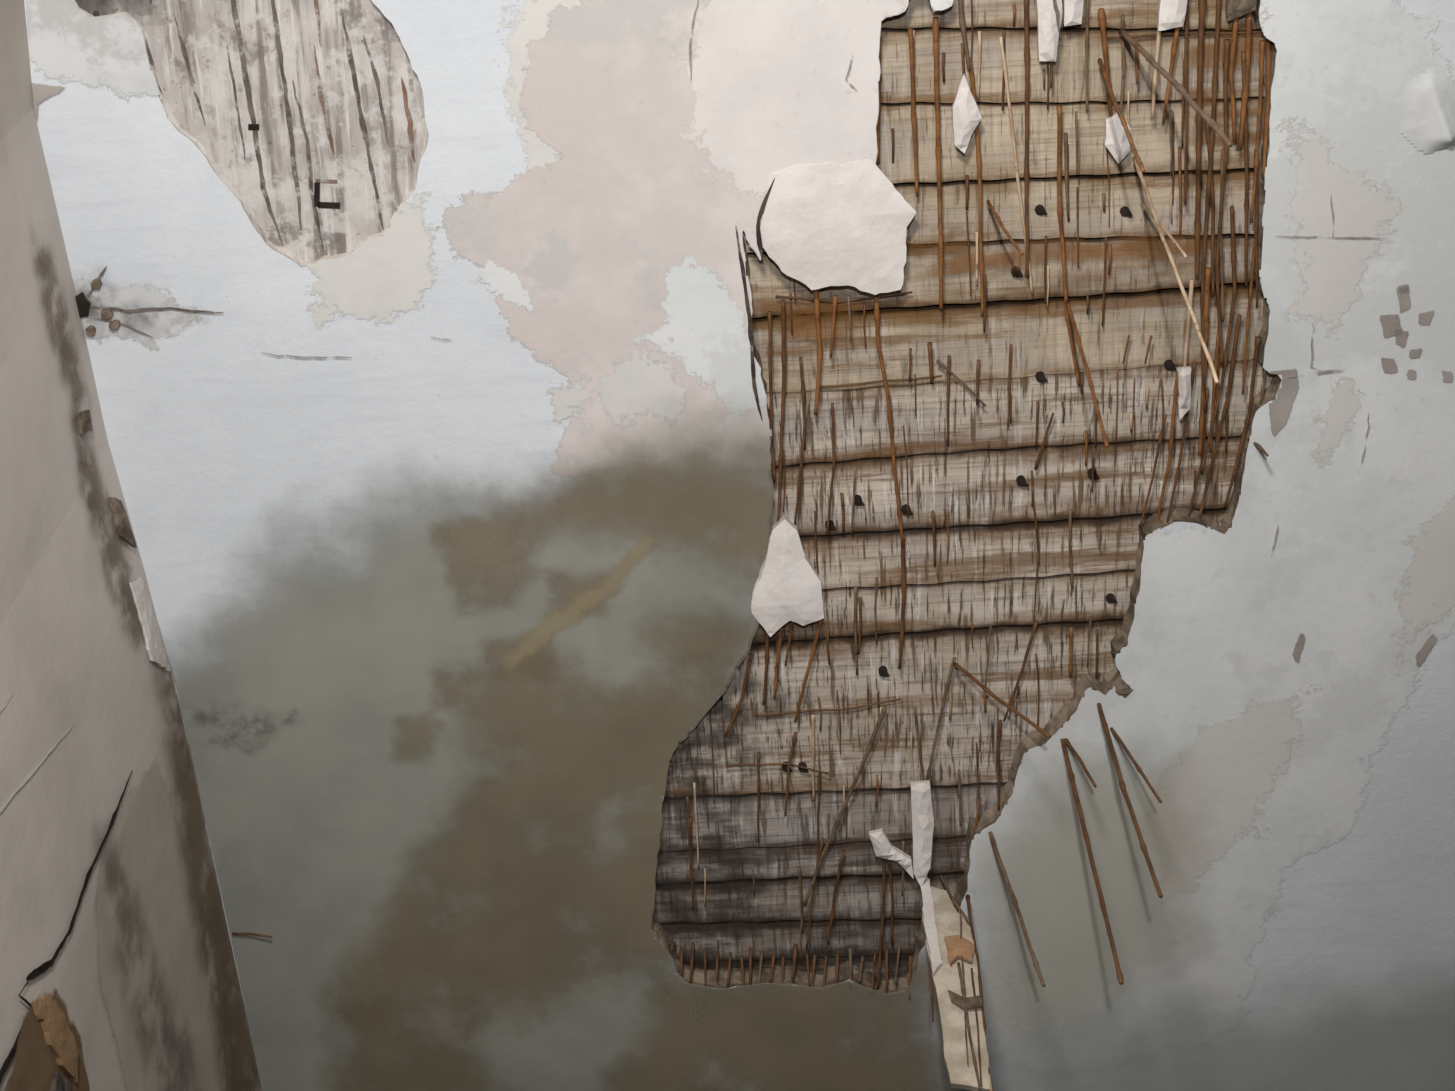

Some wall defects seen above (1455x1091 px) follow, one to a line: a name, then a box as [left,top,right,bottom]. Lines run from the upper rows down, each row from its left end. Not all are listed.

crack [1053,0,1061,36]
peeling [1276,115,1401,333]
peeling [73,276,201,352]
peeling [107,497,137,548]
peeling [129,578,171,672]
water stain [165,441,948,1091]
peeling [1147,698,1303,905]
crack [0,771,132,1083]
peeling [96,763,231,1091]
rust [944,934,974,966]
flaking render [962,948,979,997]
flaking render [977,1008,990,1091]